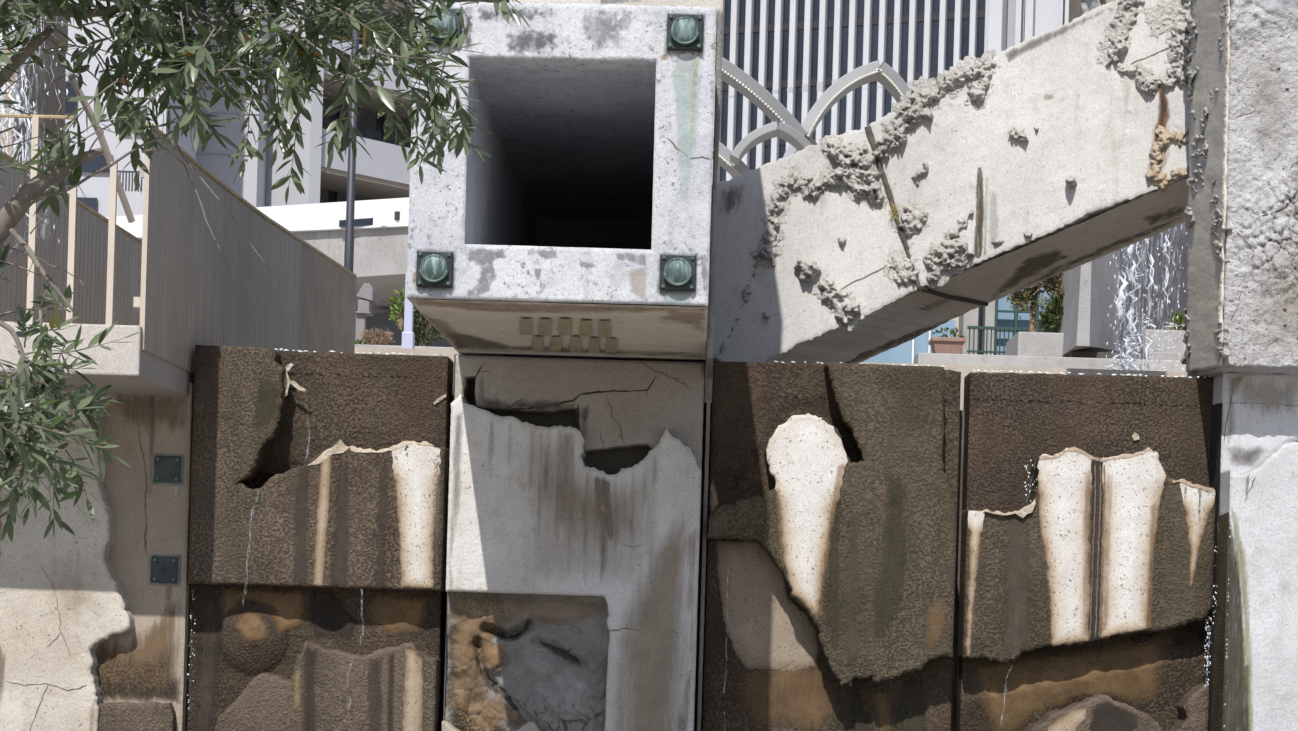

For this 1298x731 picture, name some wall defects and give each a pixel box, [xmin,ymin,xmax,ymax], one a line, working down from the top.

corrosion [1154,88,1169,142]
crack [842,266,886,289]
crack [974,169,982,257]
crack [1231,161,1298,320]
spalling [307,440,434,466]
spalling [434,355,705,472]
crack [476,361,691,444]
water stain [556,479,617,569]
spalling [983,499,1036,518]
spalling [443,591,609,731]
water stain [448,597,607,731]
water stain [626,538,680,731]